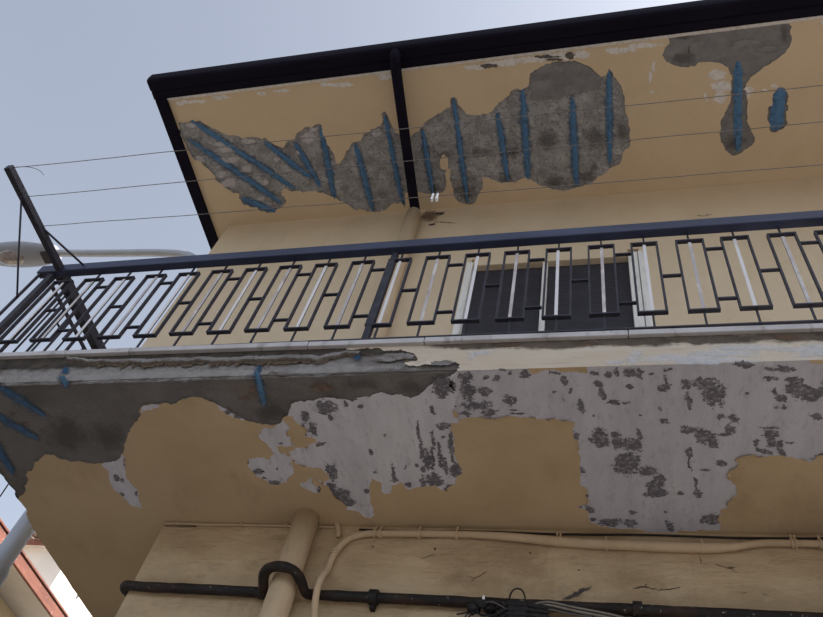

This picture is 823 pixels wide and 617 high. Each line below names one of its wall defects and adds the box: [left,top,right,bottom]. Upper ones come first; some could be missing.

spalling [176,50,631,213]
spalling [606,23,792,156]
peeling [0,348,823,533]
crack [635,583,681,591]